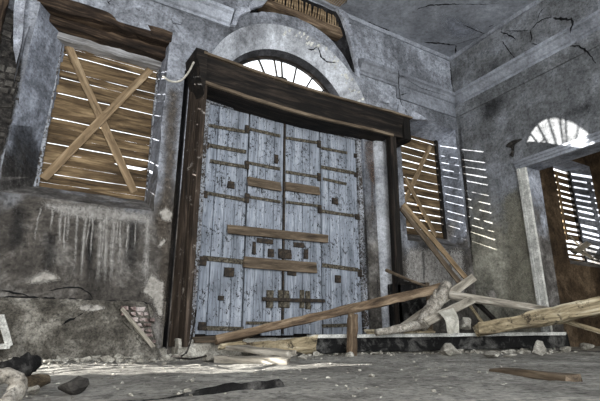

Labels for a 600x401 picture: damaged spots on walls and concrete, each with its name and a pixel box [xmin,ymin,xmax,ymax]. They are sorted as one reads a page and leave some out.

crack [418,2,497,10]
crack [425,8,596,63]
spalling [0,0,37,177]
damp [48,91,177,316]
damp [31,273,56,283]
crack [3,286,149,324]
spalling [114,302,156,345]